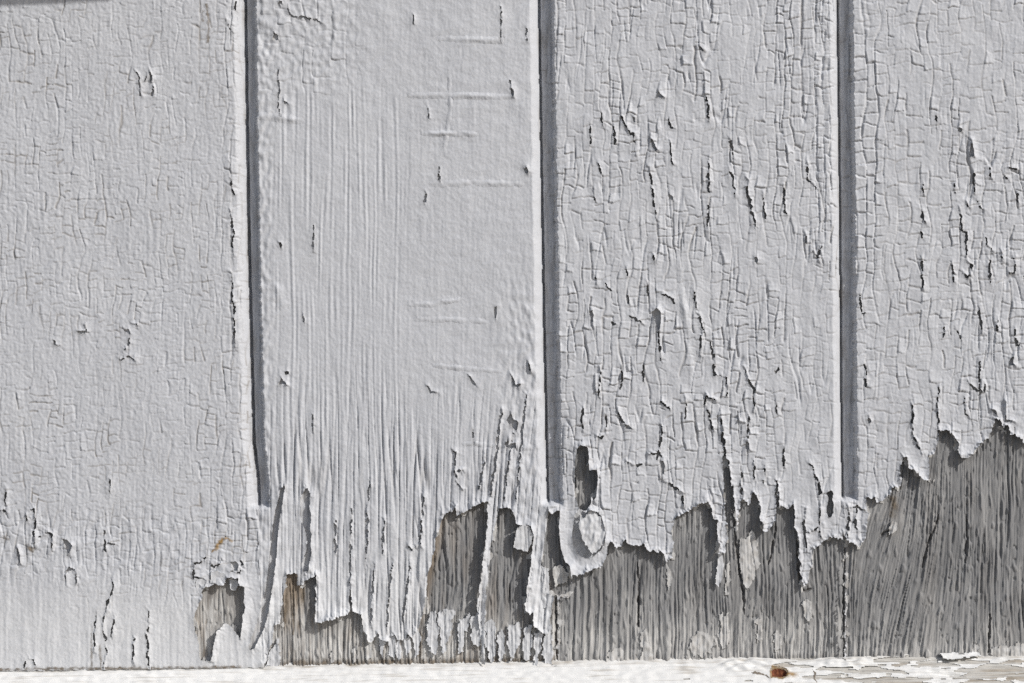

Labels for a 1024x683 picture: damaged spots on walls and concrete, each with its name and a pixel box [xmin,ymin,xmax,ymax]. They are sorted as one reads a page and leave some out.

crack [589,113,635,201]
crack [649,119,674,215]
crack [706,140,817,227]
crack [919,184,927,288]
crack [951,167,1019,283]
crack [229,282,237,339]
crack [942,310,1020,346]
crack [580,269,819,615]
crack [910,361,986,450]
crack [2,492,53,548]
peeling [193,409,1024,667]
crack [93,582,149,669]